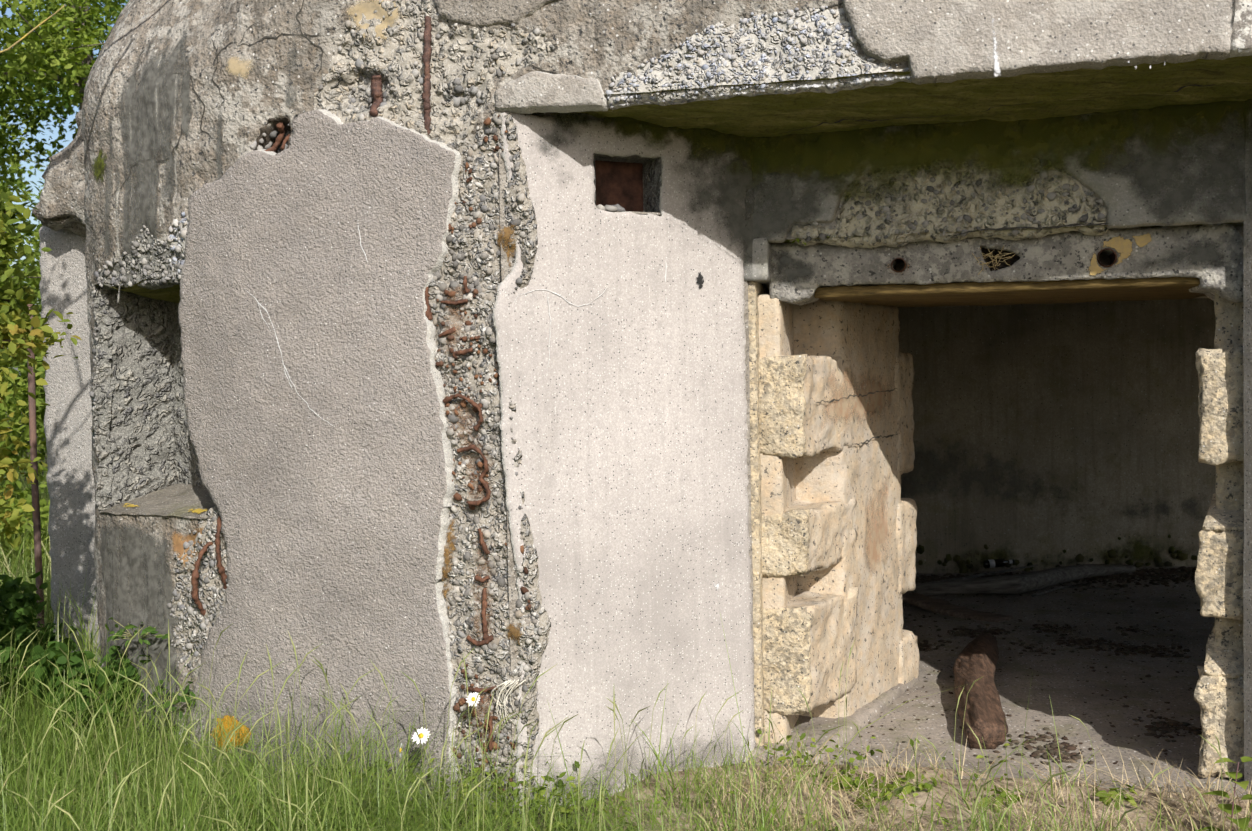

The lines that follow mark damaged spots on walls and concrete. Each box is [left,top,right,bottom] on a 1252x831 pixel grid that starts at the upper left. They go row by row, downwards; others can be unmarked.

rust [369,75,383,117]
rust [422,16,432,134]
spalling [606,6,911,110]
rust [425,276,469,320]
rust [452,347,473,357]
spalling [314,0,555,808]
rust [443,393,491,506]
rust [172,516,227,616]
rust [441,522,456,609]
rust [477,528,490,555]
rust [466,575,522,646]